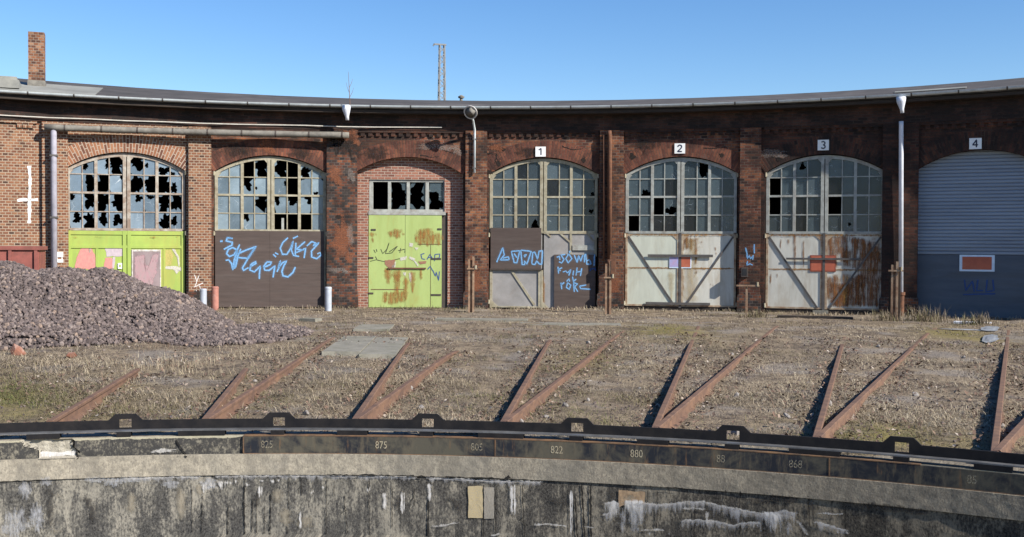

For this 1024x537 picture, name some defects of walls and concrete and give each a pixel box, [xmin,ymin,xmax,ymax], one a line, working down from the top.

rust [415,229,440,246]
rust [384,269,422,304]
rust [770,234,881,307]
spalling [20,438,78,459]
damp [427,477,541,512]
damp [537,492,573,532]
damp [603,490,807,535]